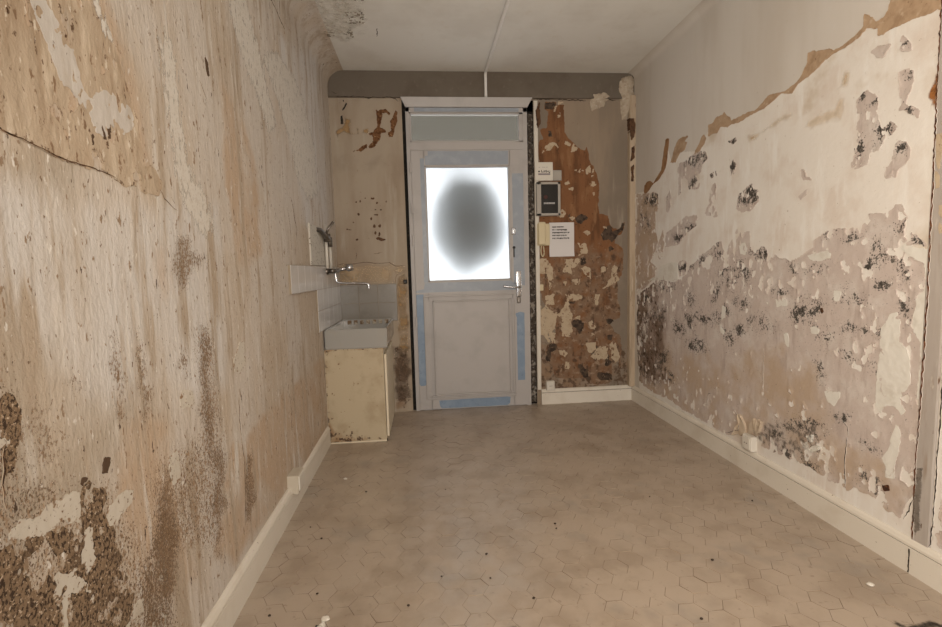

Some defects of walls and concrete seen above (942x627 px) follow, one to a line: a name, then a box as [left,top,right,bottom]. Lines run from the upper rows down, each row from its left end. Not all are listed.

crack [0,127,116,178]
flaking render [0,0,162,196]
peeling [542,141,578,153]
flaking render [627,118,636,182]
peeling [540,230,620,369]
flaking render [824,391,840,406]
flaking render [875,232,928,491]
flaking render [0,393,181,627]